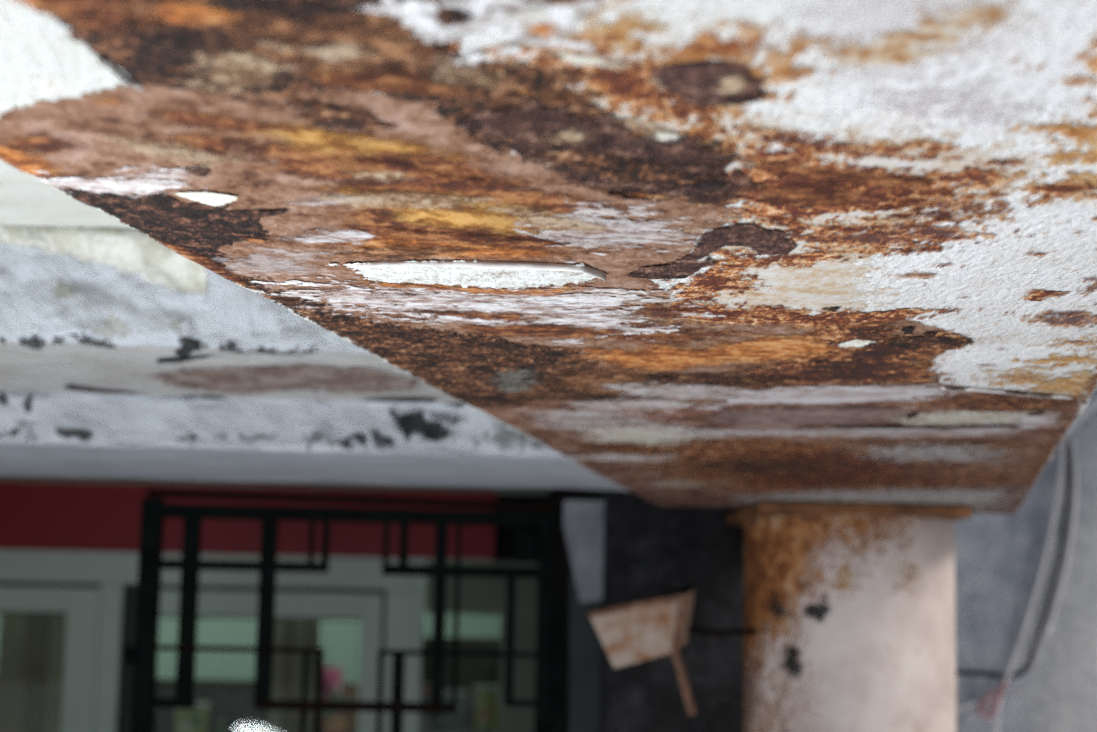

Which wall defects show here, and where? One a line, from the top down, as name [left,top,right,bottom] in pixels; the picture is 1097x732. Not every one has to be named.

peeling [0,82,1085,514]
rust [23,0,1097,514]
rust [743,514,924,682]